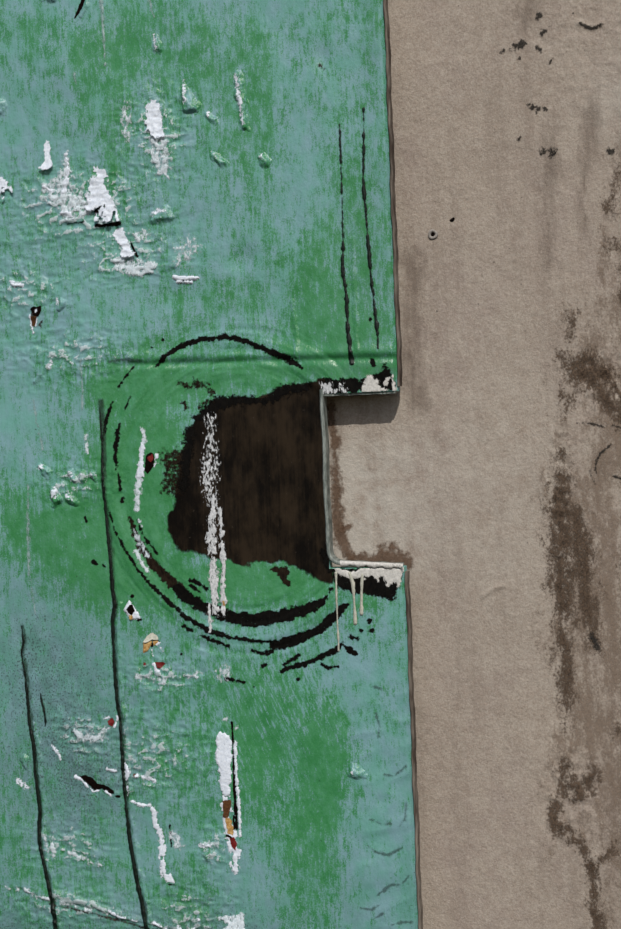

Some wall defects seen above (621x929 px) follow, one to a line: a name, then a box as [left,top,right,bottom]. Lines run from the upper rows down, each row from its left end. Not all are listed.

peeling [38,140,158,277]
peeling [144,99,172,178]
peeling [172,237,200,284]
peeling [133,363,404,601]
corrosion [327,402,412,569]
damp [99,401,374,929]
damp [541,287,621,929]
peeling [106,762,185,885]
peeling [215,718,242,875]
peeling [218,912,245,929]